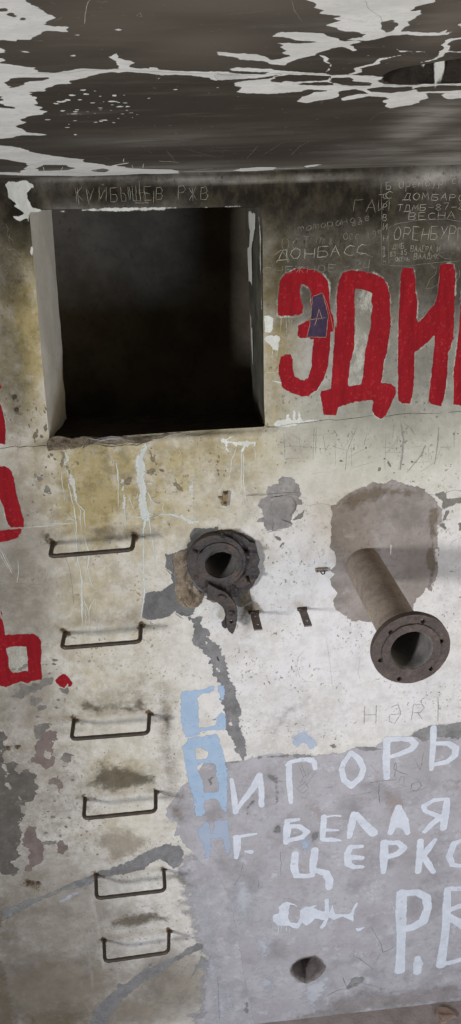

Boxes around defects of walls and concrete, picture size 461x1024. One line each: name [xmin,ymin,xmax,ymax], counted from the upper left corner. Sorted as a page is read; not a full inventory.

spalling [382,59,461,86]
leakage [27,452,104,640]
leakage [116,436,259,620]
peeling [0,659,82,876]